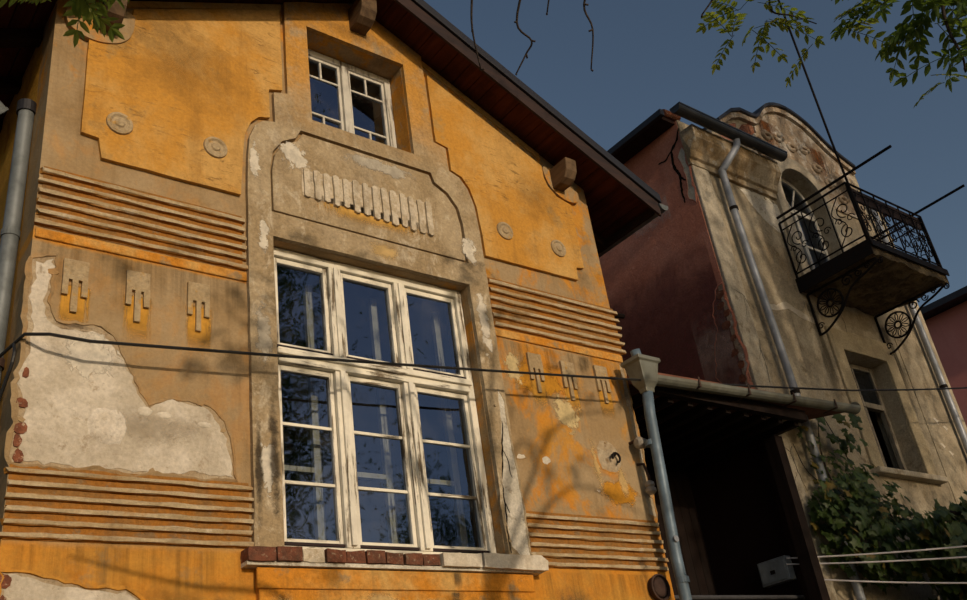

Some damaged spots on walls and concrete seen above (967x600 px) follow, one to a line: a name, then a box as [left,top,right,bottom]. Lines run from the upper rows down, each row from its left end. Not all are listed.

peeling [278,141,310,169]
peeling [462,238,477,264]
spalling [712,281,755,389]
peeling [4,254,238,482]
peeling [595,439,623,474]
crack [501,423,512,553]
peeling [0,568,148,600]